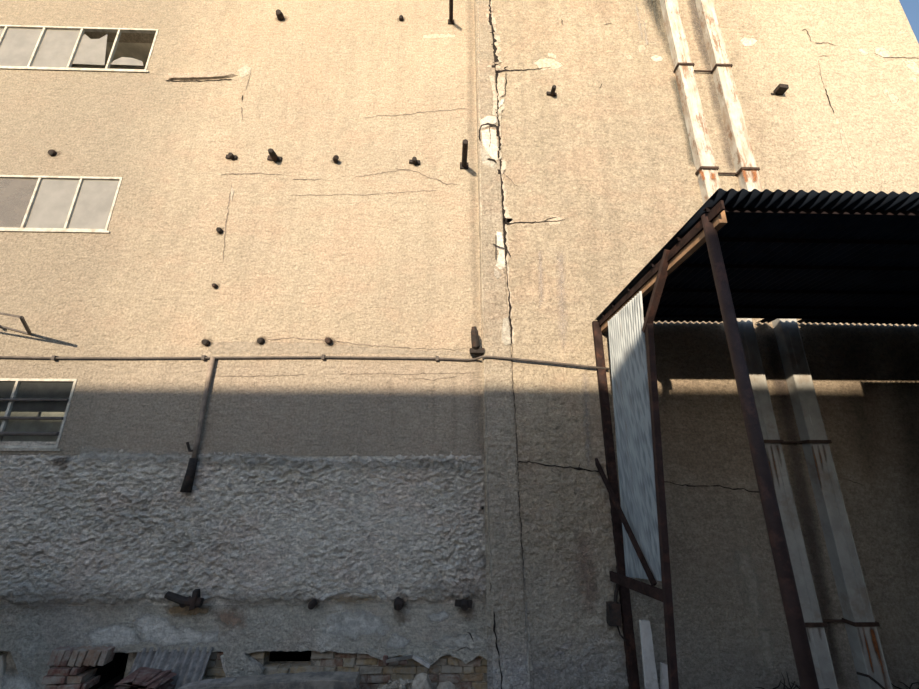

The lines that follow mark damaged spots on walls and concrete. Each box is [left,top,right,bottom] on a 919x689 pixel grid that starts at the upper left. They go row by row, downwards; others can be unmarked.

peeling [533,53,563,70]
crack [802,29,836,113]
spalling [478,12,507,463]
spalling [493,232,511,280]
crack [486,0,599,580]
crack [664,481,759,493]
spalling [89,652,138,689]
spalling [202,652,230,680]
spalling [249,651,488,689]
corrosion [859,628,887,689]